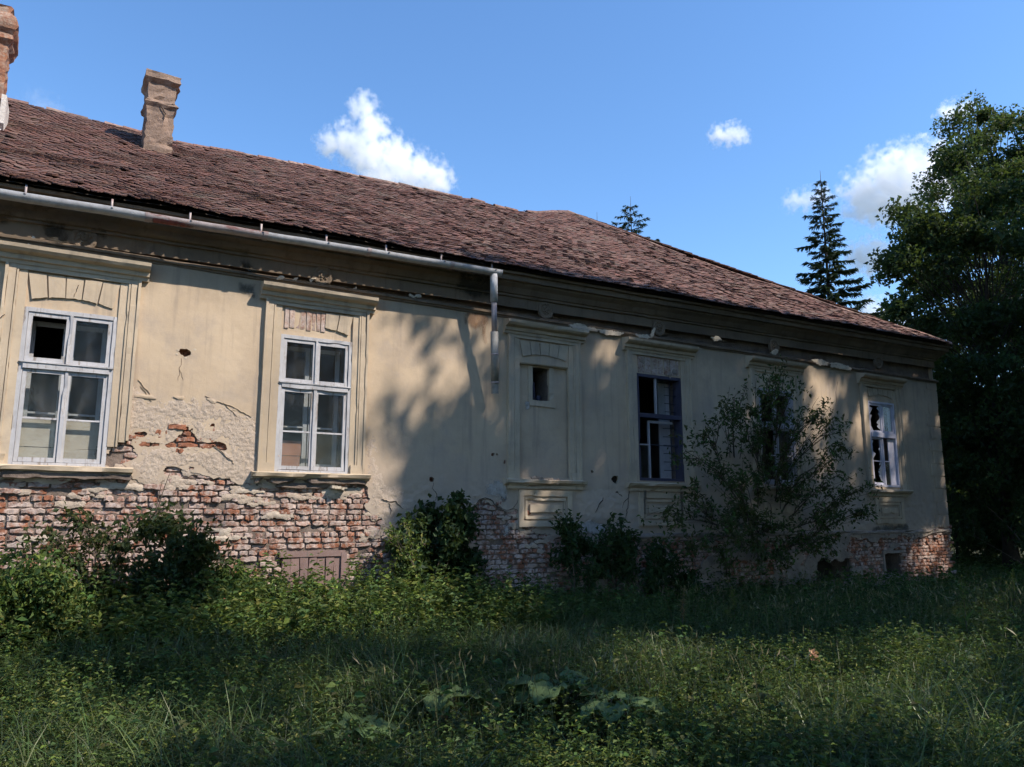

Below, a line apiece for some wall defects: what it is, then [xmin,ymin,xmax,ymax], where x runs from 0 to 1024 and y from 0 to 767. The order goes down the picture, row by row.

flaking render [0,387,837,602]
flaking render [845,525,957,583]